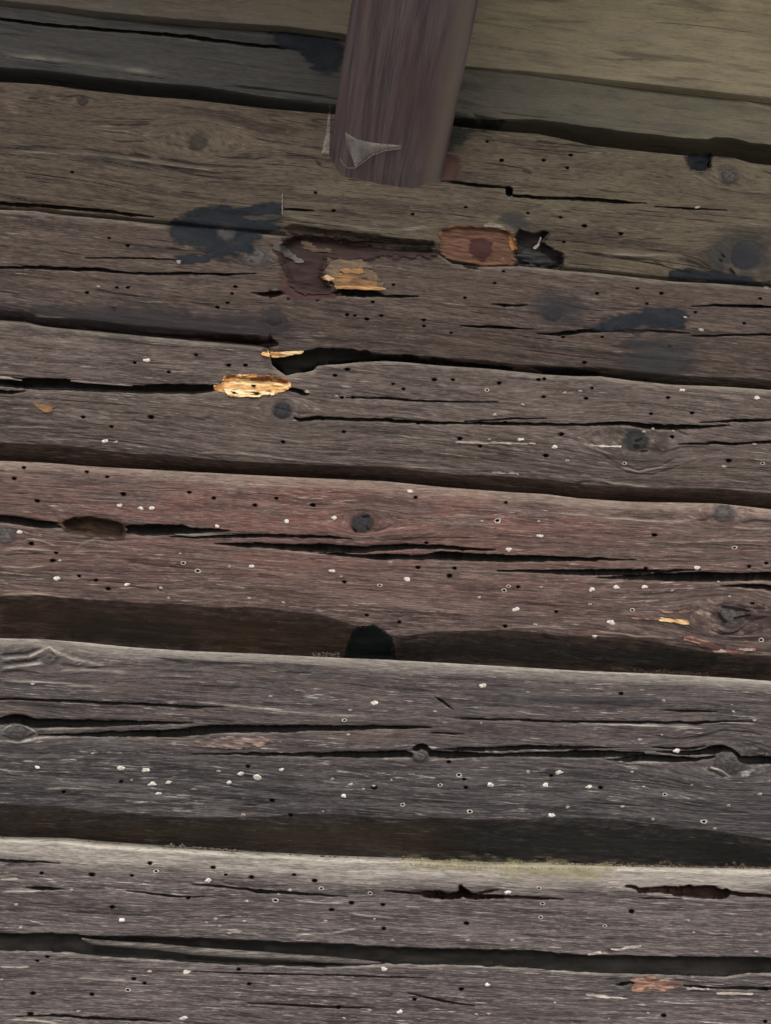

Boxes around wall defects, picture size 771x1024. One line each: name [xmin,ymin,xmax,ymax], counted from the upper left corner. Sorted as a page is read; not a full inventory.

damp [169,202,283,264]
peeling [483,222,517,251]
peeling [320,268,386,290]
damp [594,308,689,378]
peeling [224,374,289,396]
crack [145,333,771,445]
crack [0,515,62,527]
crack [125,524,771,590]
crack [0,698,771,763]
crack [388,885,557,899]
crack [625,885,771,899]